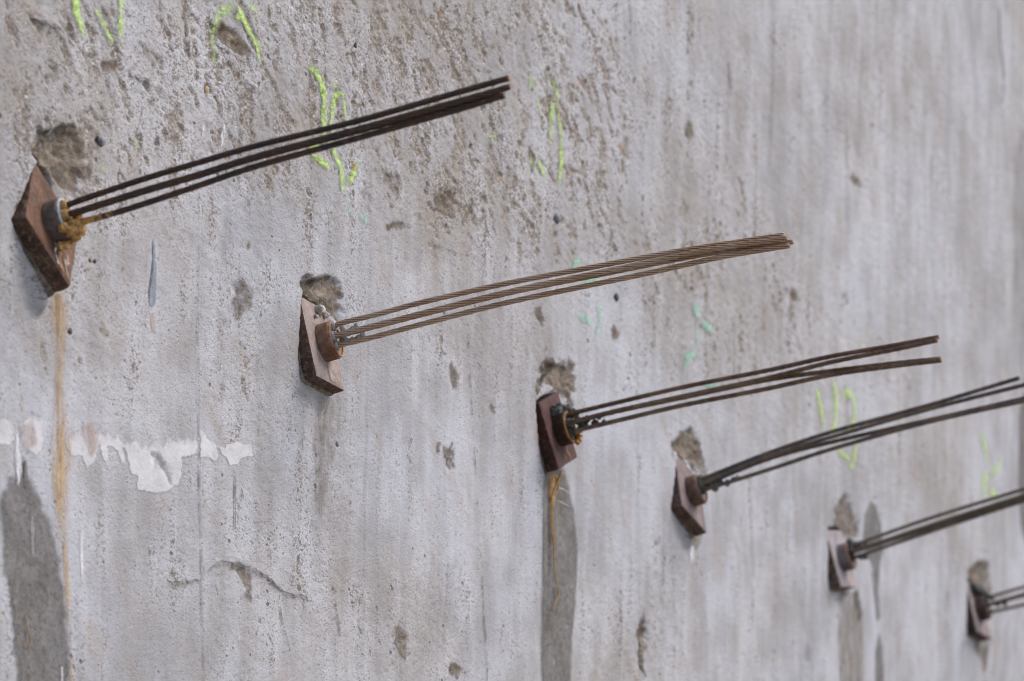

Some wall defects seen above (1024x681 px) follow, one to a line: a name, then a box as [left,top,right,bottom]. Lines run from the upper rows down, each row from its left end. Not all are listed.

spalling [31,123,87,197]
spalling [299,274,343,322]
spalling [535,358,576,407]
peeling [0,416,44,456]
peeling [64,424,254,493]
spalling [671,425,708,476]
damp [1,435,84,681]
damp [542,469,578,681]